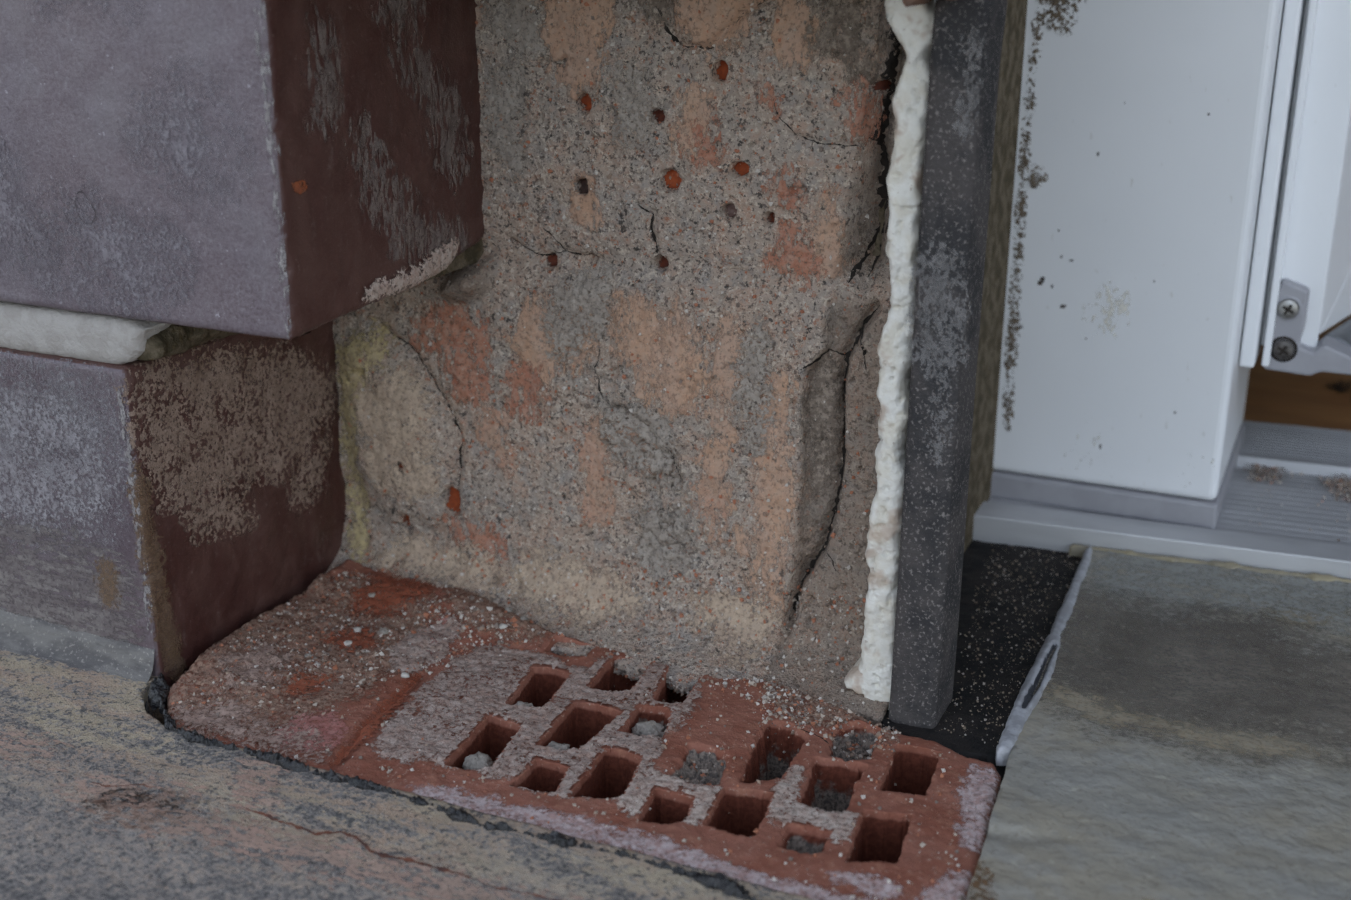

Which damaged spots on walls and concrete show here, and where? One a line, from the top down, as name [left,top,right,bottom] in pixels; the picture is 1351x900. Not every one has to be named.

crack [658,0,767,50]
crack [506,228,601,258]
crack [638,204,658,253]
crack [774,27,900,621]
crack [594,339,646,421]
crack [388,329,463,493]
peeling [203,638,342,698]
peeling [319,614,464,673]
leakage [1036,546,1351,768]